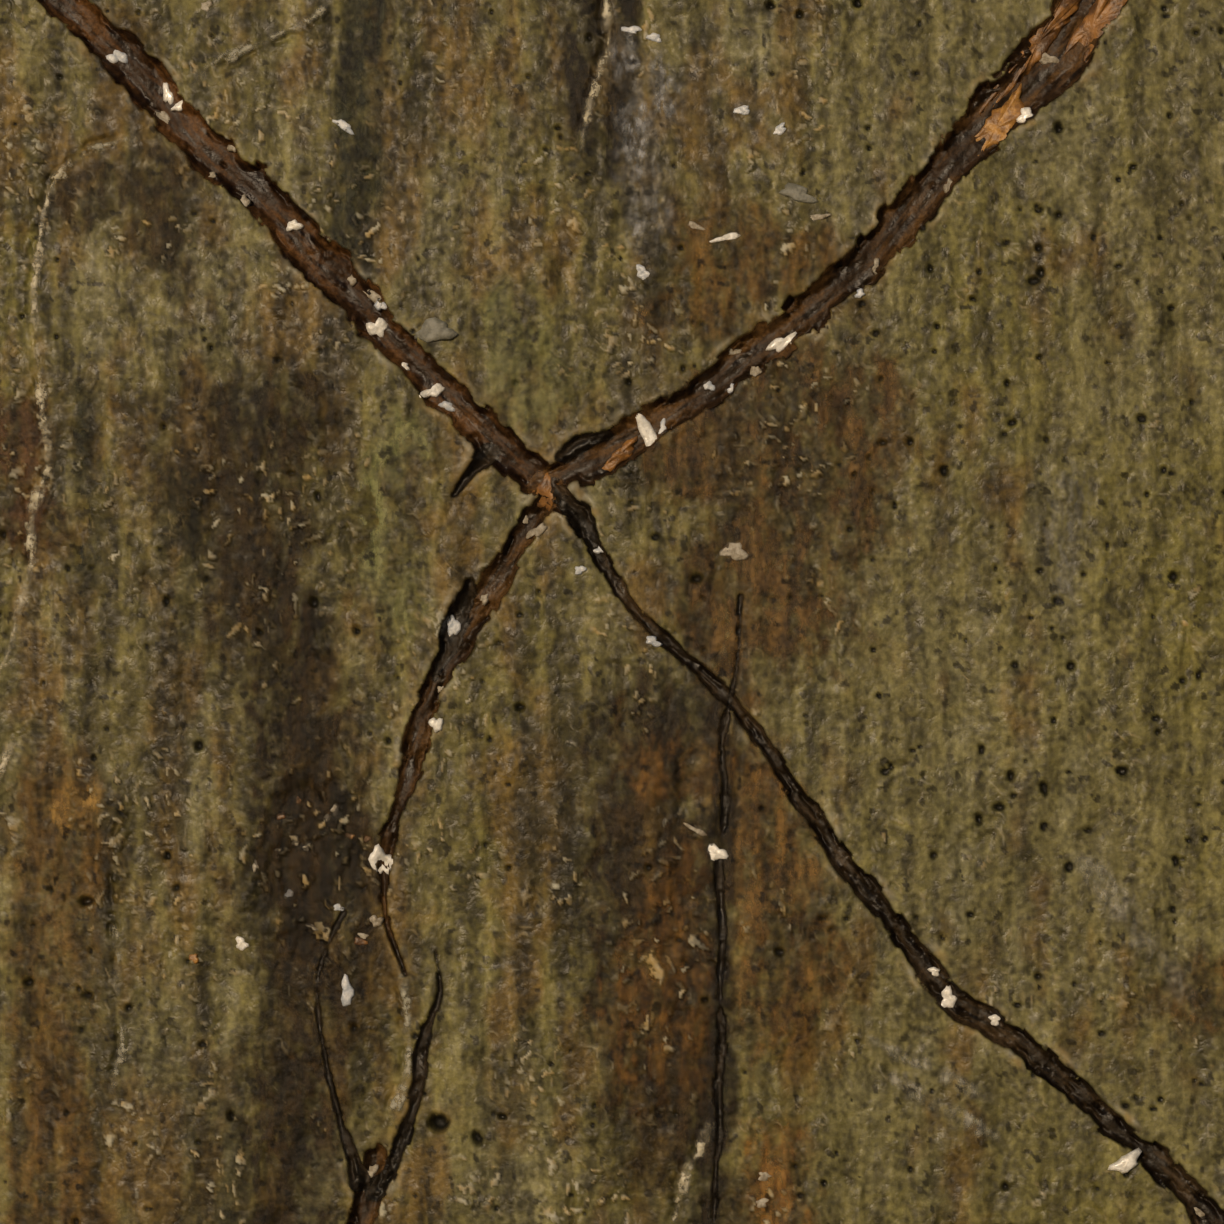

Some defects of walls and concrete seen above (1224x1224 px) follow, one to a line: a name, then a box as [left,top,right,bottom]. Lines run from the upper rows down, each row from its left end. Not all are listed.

crack [26,375,51,568]
leakage [73,381,91,495]
crack [31,0,1128,976]
crack [0,754,9,772]
crack [114,1034,128,1075]
leakage [157,357,382,1224]
crack [314,901,443,1224]
leakage [569,667,737,1224]
crack [676,1167,691,1202]
crack [695,1142,705,1157]
crack [710,846,728,1223]
crack [718,594,1224,1224]